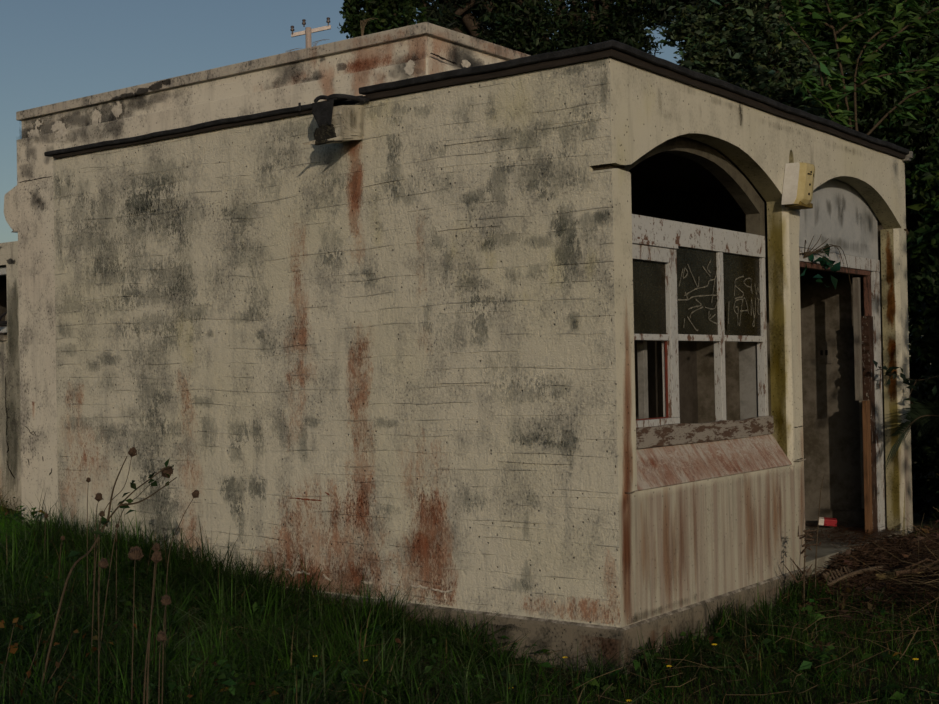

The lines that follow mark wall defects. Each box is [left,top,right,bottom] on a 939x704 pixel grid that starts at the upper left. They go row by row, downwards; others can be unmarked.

peeling [28,118,69,142]
corrosion [887,243,895,323]
corrosion [889,340,897,398]